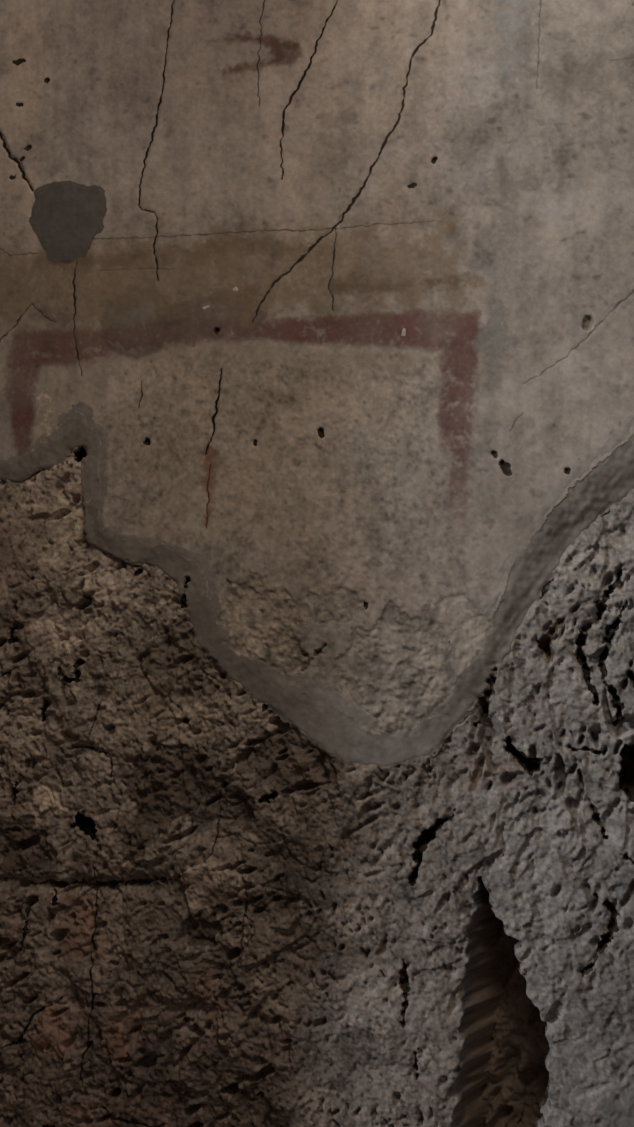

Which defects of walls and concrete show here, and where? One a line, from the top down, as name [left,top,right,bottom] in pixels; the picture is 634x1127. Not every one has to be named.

crack [0,132,34,192]
crack [138,0,175,282]
crack [252,0,440,323]
crack [205,368,222,528]
spalling [491,451,512,476]
spalling [219,575,494,735]
spalling [2,815,51,886]
spalling [121,741,207,859]
spalling [236,727,339,800]